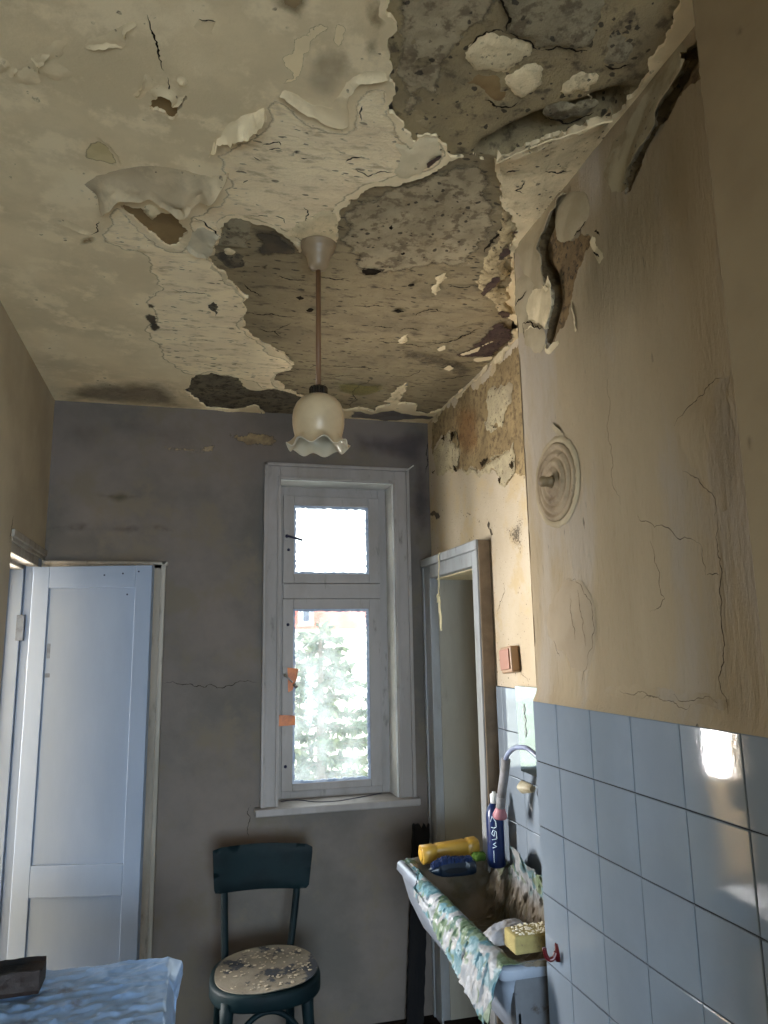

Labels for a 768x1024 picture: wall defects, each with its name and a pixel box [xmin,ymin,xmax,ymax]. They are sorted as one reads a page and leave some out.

peeling [85,21,137,51]
crack [147,15,170,89]
peeling [86,138,123,168]
spalling [103,0,701,488]
water stain [78,387,169,403]
crack [641,521,728,708]